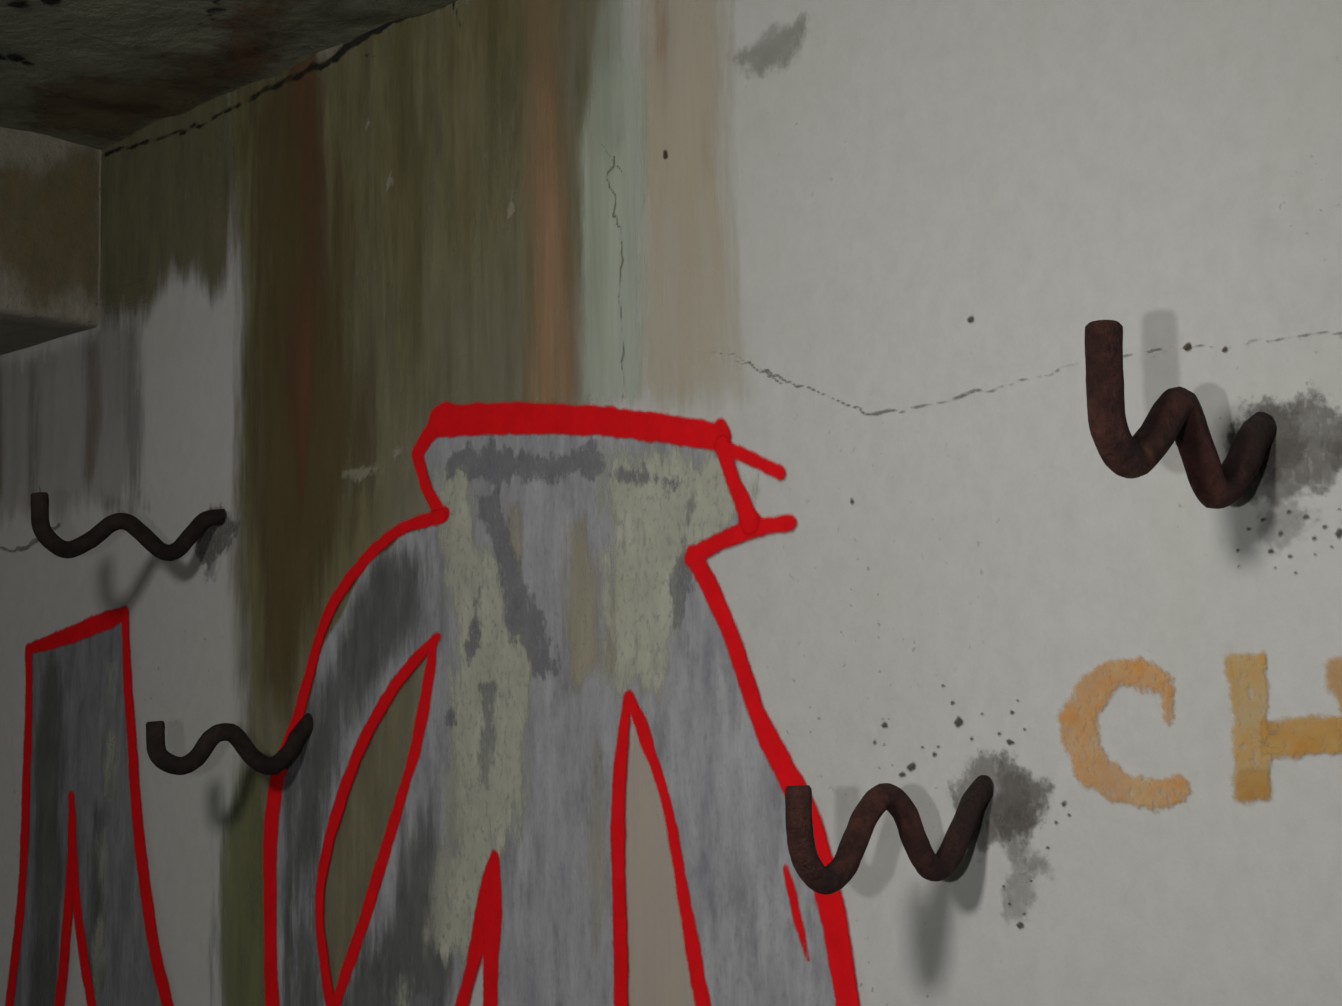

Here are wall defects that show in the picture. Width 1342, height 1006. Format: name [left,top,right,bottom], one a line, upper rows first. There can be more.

leakage [739,21,803,72]
leakage [255,60,365,695]
crack [607,156,624,397]
leakage [581,0,717,399]
crack [720,353,1024,415]